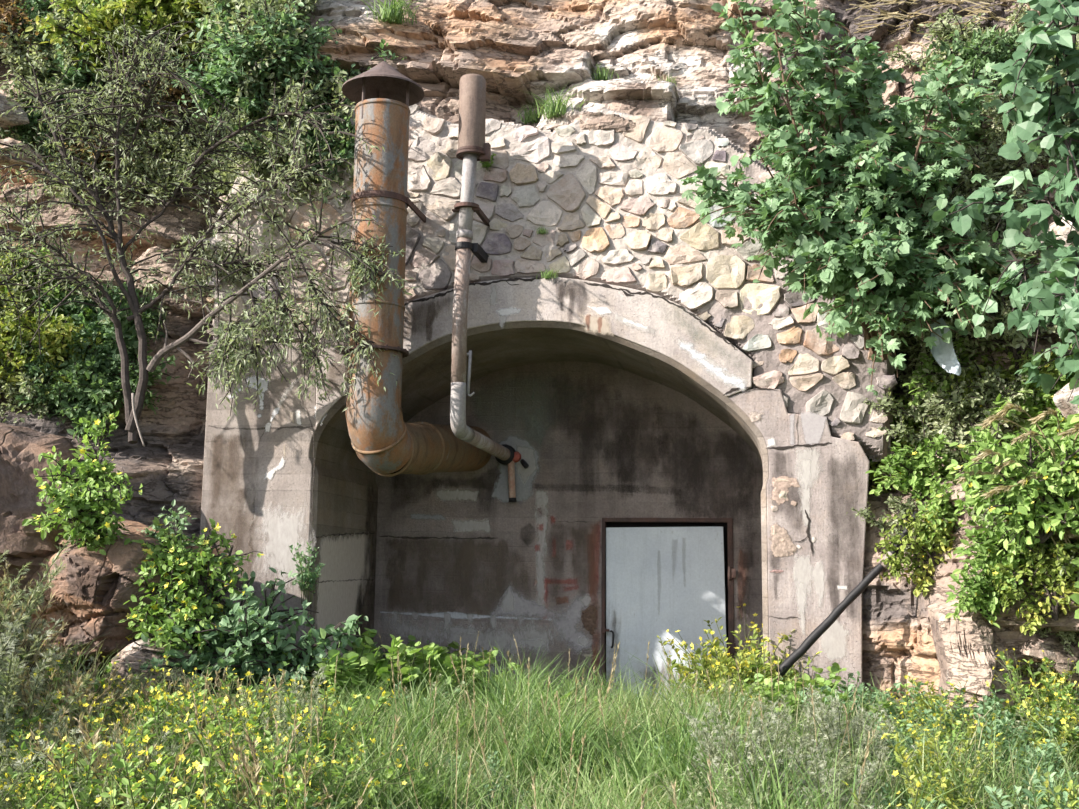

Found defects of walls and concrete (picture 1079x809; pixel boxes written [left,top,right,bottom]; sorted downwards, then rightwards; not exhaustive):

peeling [264,445,285,479]
peeling [492,436,539,503]
water stain [572,389,750,518]
spalling [771,476,800,511]
spalling [769,524,816,573]
crack [793,510,816,555]